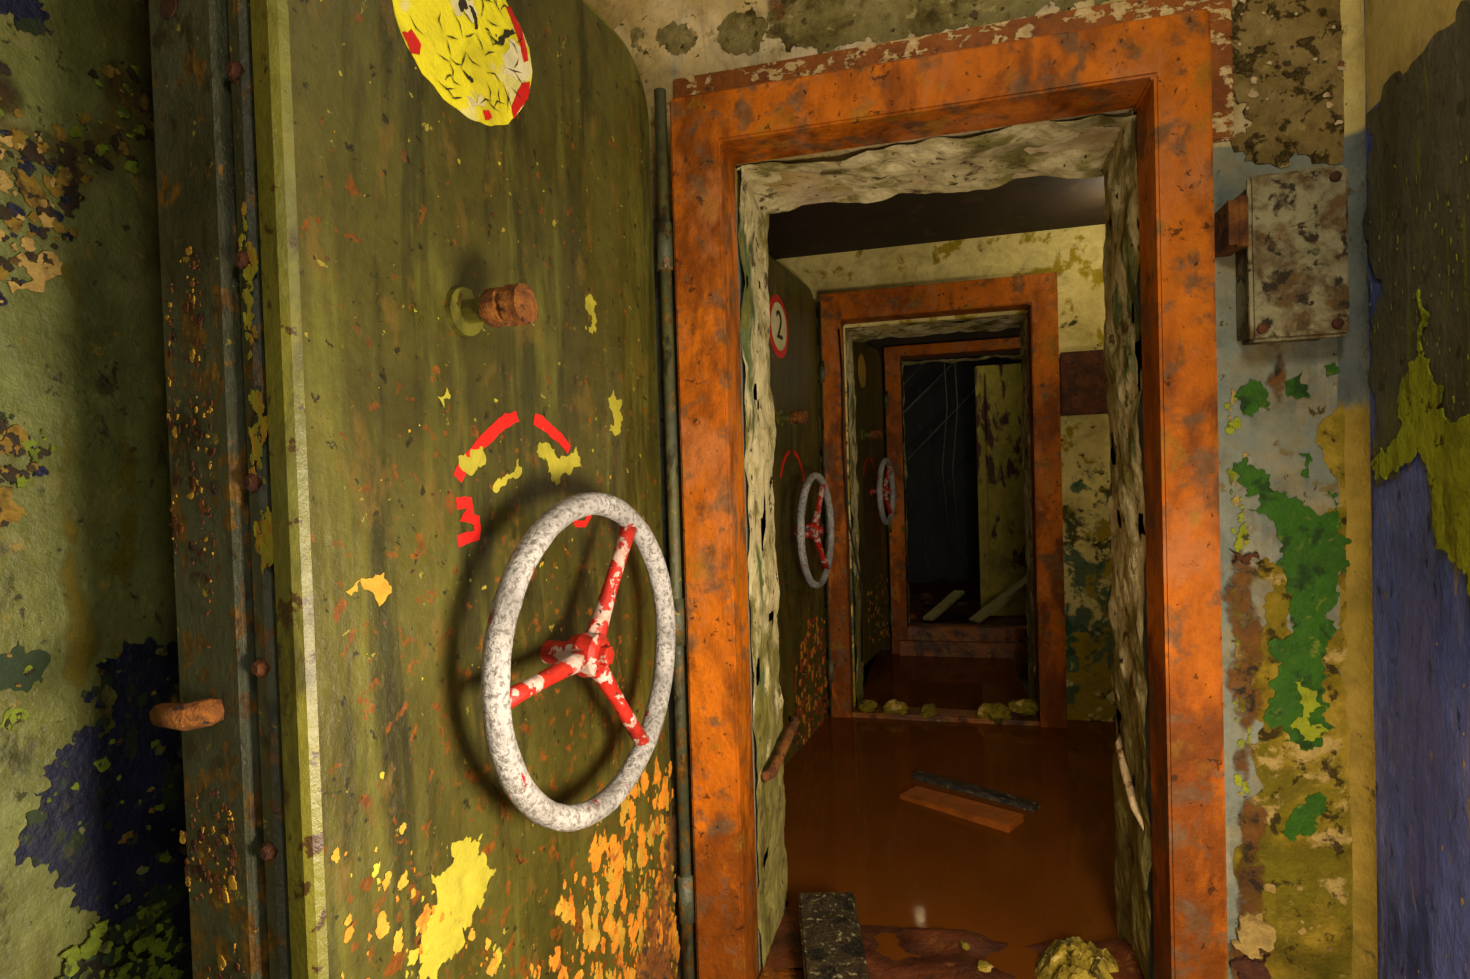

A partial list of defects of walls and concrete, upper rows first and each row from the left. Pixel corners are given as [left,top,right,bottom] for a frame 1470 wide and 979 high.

damp [0,60,155,180]
flaking render [717,0,1109,56]
spalling [1230,0,1347,169]
peeling [0,129,89,306]
peeling [1363,0,1470,596]
corrosion [164,246,217,617]
peeling [1224,373,1311,435]
peeling [0,640,51,731]
flaking render [1227,406,1353,979]
peeling [14,636,193,979]
peeling [343,833,505,979]
peeling [526,756,680,979]